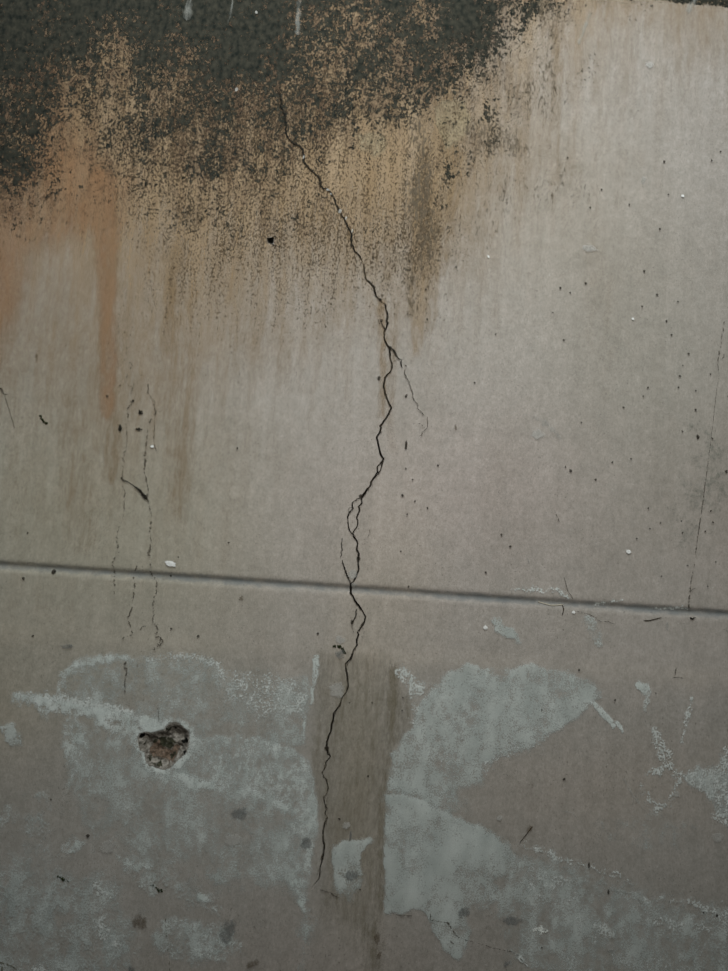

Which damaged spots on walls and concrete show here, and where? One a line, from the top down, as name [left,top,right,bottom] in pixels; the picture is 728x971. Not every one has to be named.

leakage [0,0,597,332]
crack [278,76,428,898]
spalling [17,690,317,937]